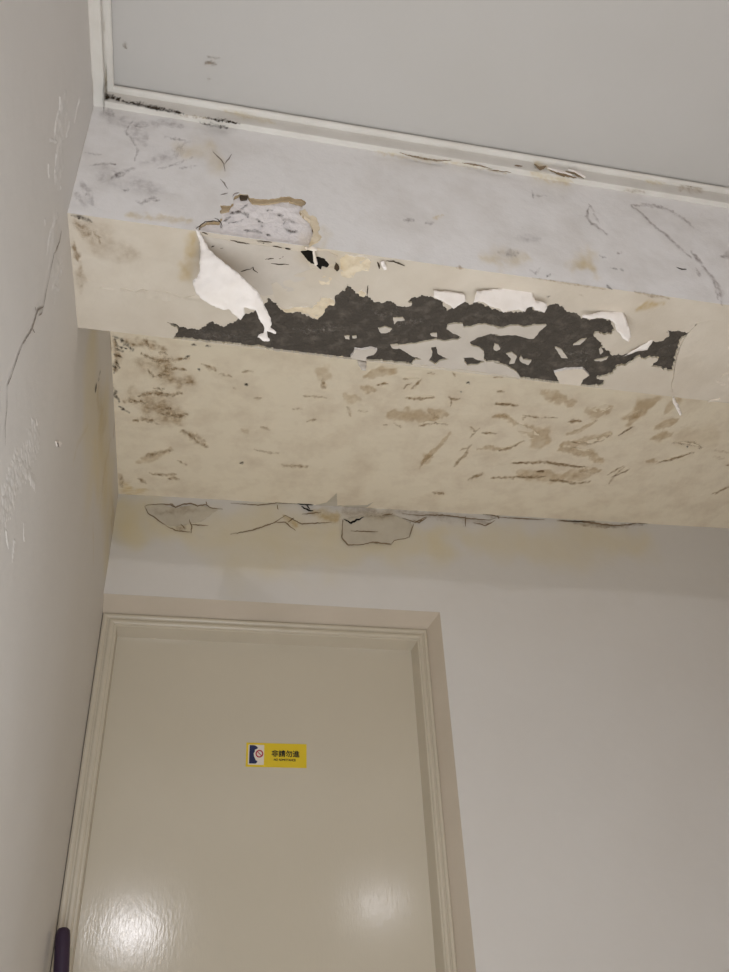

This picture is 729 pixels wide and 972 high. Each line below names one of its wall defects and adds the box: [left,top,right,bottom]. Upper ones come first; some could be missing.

damp [103,88,181,114]
crack [7,232,62,386]
spalling [172,195,729,416]